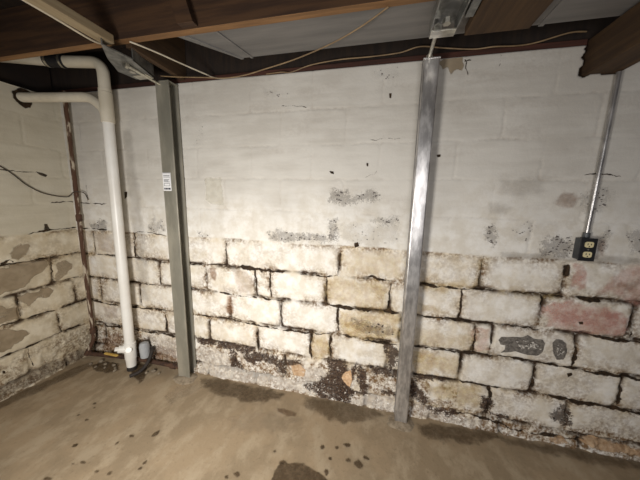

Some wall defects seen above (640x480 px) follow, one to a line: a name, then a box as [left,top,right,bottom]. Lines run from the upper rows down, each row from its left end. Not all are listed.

peeling [440,57,464,73]
peeling [11,244,30,260]
peeling [55,261,72,281]
peeling [0,287,53,352]
damp [93,362,118,373]
damp [131,338,171,382]
damp [194,324,399,408]
peeling [499,335,545,356]
peeling [553,339,567,360]
damp [410,371,492,442]
damp [480,395,513,421]
damp [550,404,572,426]